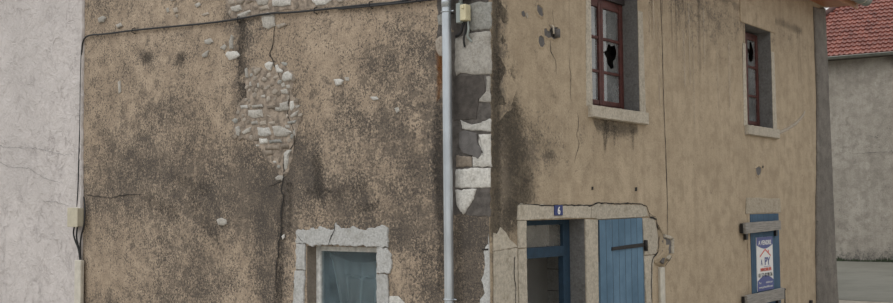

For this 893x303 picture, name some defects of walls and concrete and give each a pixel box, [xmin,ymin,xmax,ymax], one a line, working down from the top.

flaking render [202,35,240,60]
flaking render [226,0,348,30]
flaking render [232,61,303,181]
flaking render [435,0,493,217]
crack [271,97,301,292]